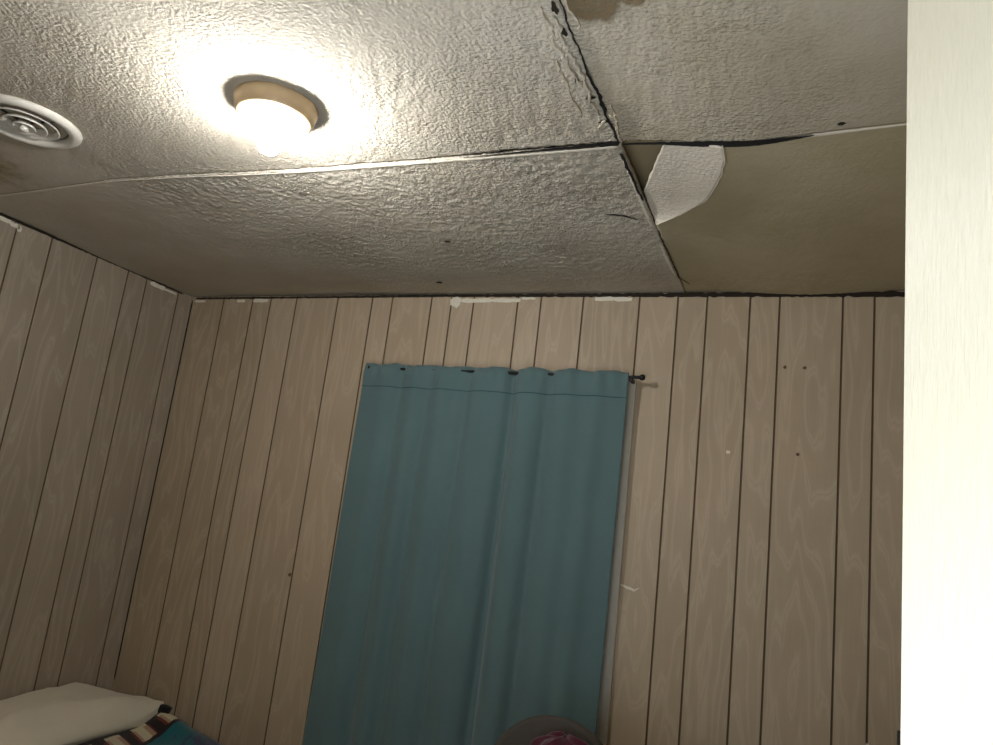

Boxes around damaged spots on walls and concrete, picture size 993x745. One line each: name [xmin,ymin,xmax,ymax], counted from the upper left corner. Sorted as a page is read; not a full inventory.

damp [567,0,643,22]
peeling [644,141,726,226]